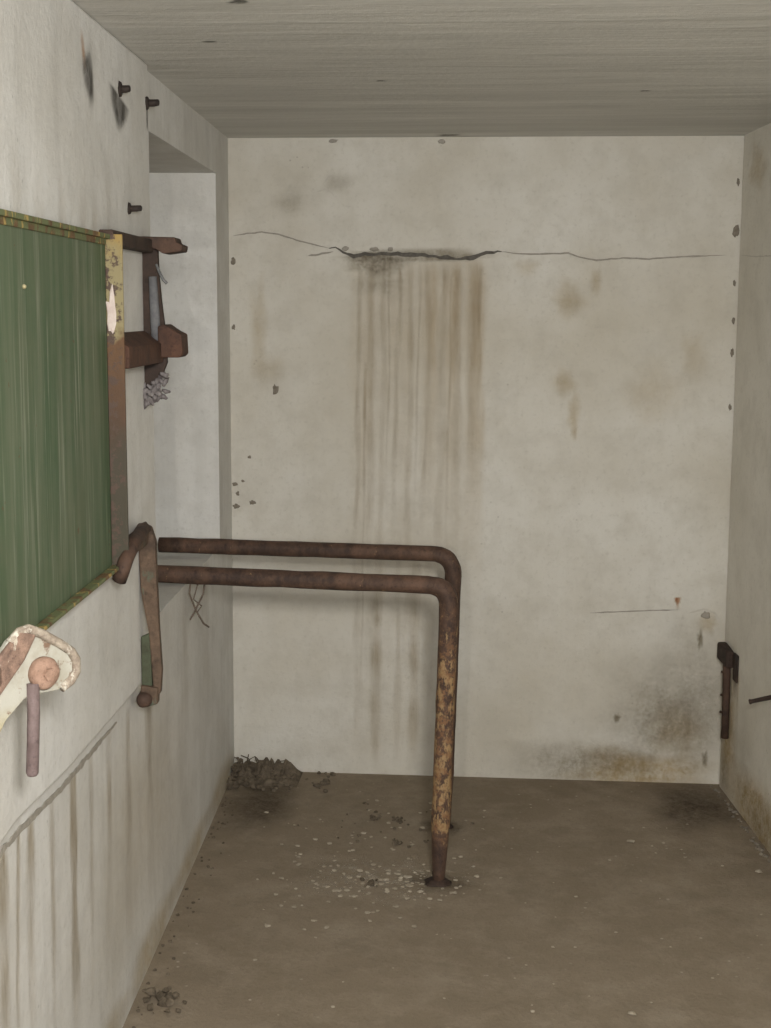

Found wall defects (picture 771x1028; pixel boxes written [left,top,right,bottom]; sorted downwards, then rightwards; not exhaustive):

crack [233,231,771,261]